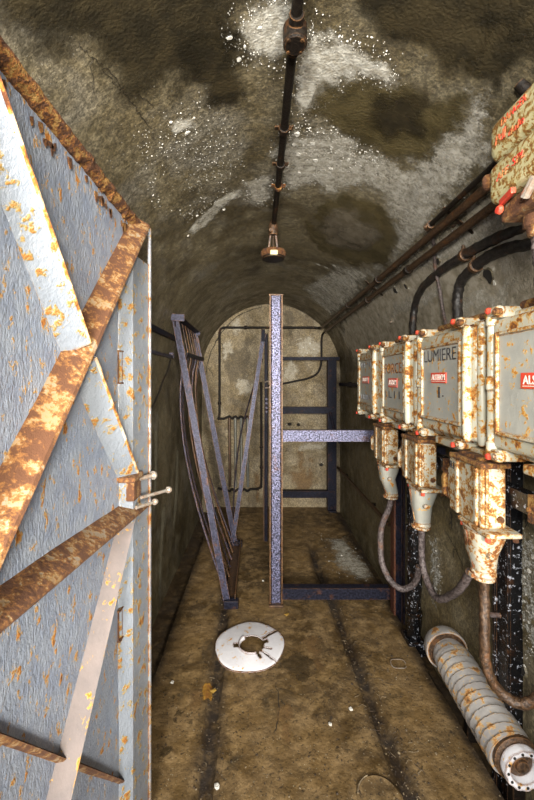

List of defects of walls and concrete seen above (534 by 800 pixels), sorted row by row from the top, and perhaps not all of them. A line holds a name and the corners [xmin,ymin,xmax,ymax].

damp [0,0,534,364]